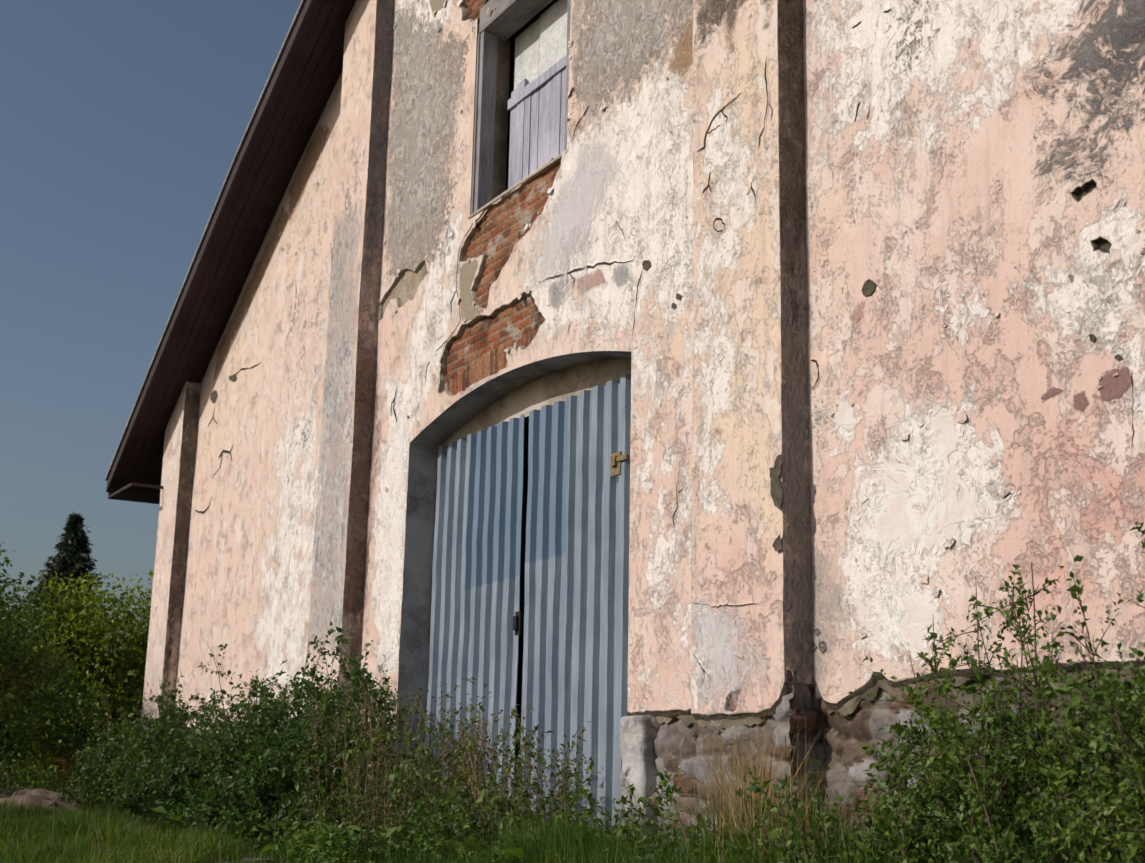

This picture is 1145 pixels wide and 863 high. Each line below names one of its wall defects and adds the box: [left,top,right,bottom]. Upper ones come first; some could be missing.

mould [1026,0,1145,182]
peeling [377,0,492,323]
flaking render [436,157,628,396]
crack [539,218,644,339]
crack [697,55,772,234]
flaking render [1070,178,1097,202]
peeling [1090,189,1145,281]
crack [235,362,261,375]
peeling [1041,367,1133,411]
crack [195,446,233,514]
flaking render [628,682,799,734]